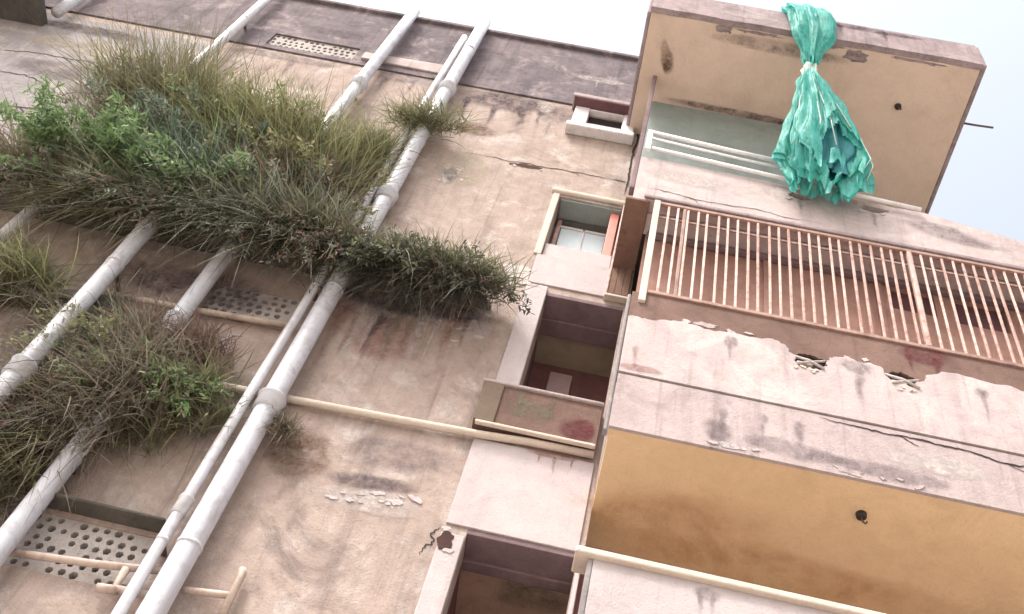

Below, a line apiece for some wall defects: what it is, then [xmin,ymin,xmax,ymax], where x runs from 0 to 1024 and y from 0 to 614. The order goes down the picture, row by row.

peeling [831,45,869,63]
crack [462,134,821,224]
peeling [682,319,754,335]
spalling [794,355,826,373]
spalling [884,373,920,392]
crack [820,417,1024,472]
peeling [324,489,422,516]
spalling [436,526,454,553]